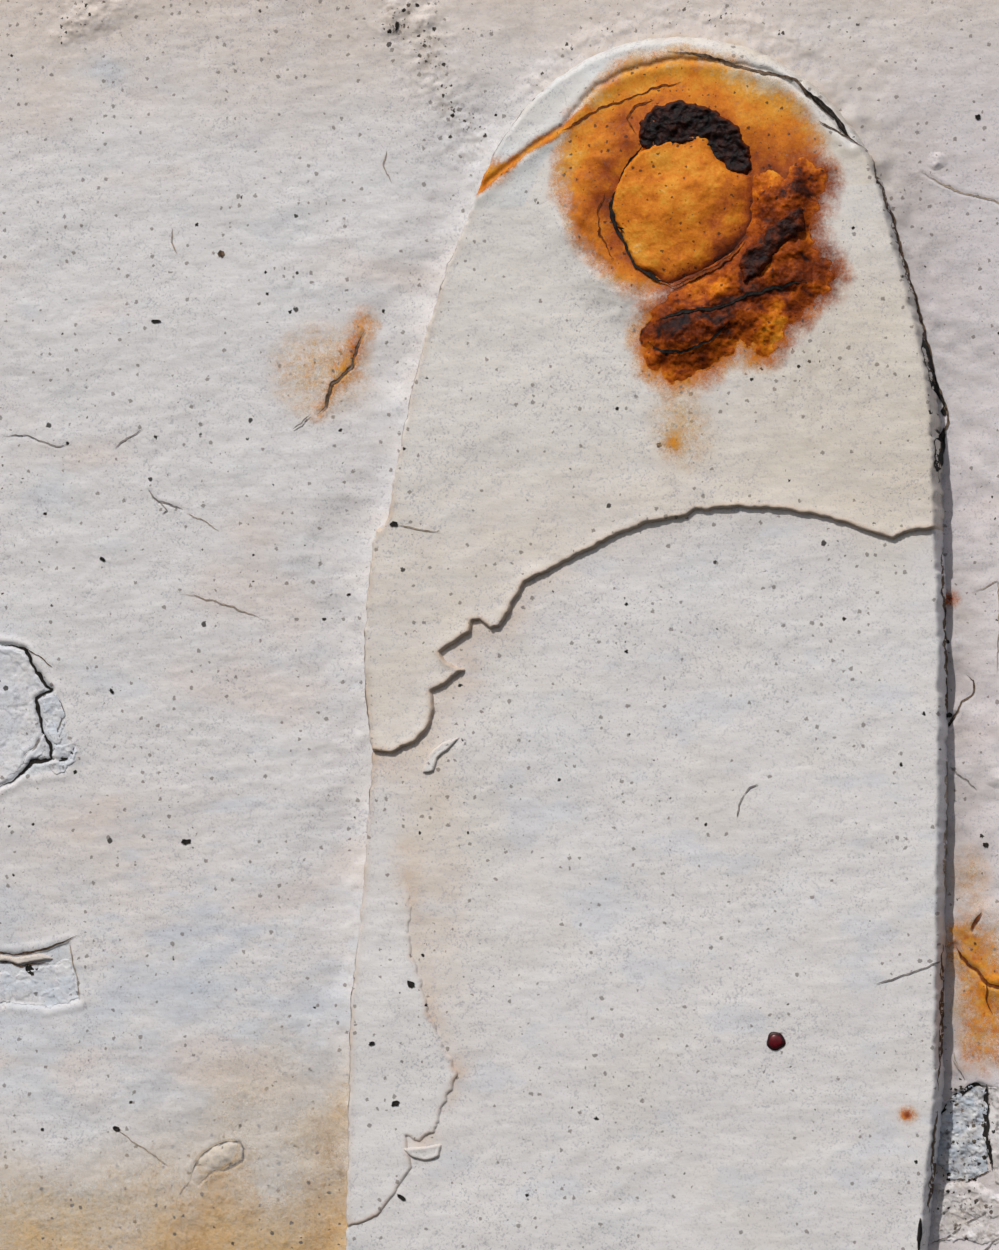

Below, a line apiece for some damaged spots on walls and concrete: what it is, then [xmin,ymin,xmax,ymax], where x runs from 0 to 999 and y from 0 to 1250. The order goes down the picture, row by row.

rust [476,47,850,395]
rust [301,316,372,394]
peeling [364,36,948,754]
rust [665,408,686,452]
spalling [0,645,77,787]
peeling [423,738,459,773]
peeling [0,935,79,1009]
peeling [346,880,459,1227]
rust [948,926,999,1058]
water stain [0,1165,347,1250]
spalling [917,1082,999,1250]